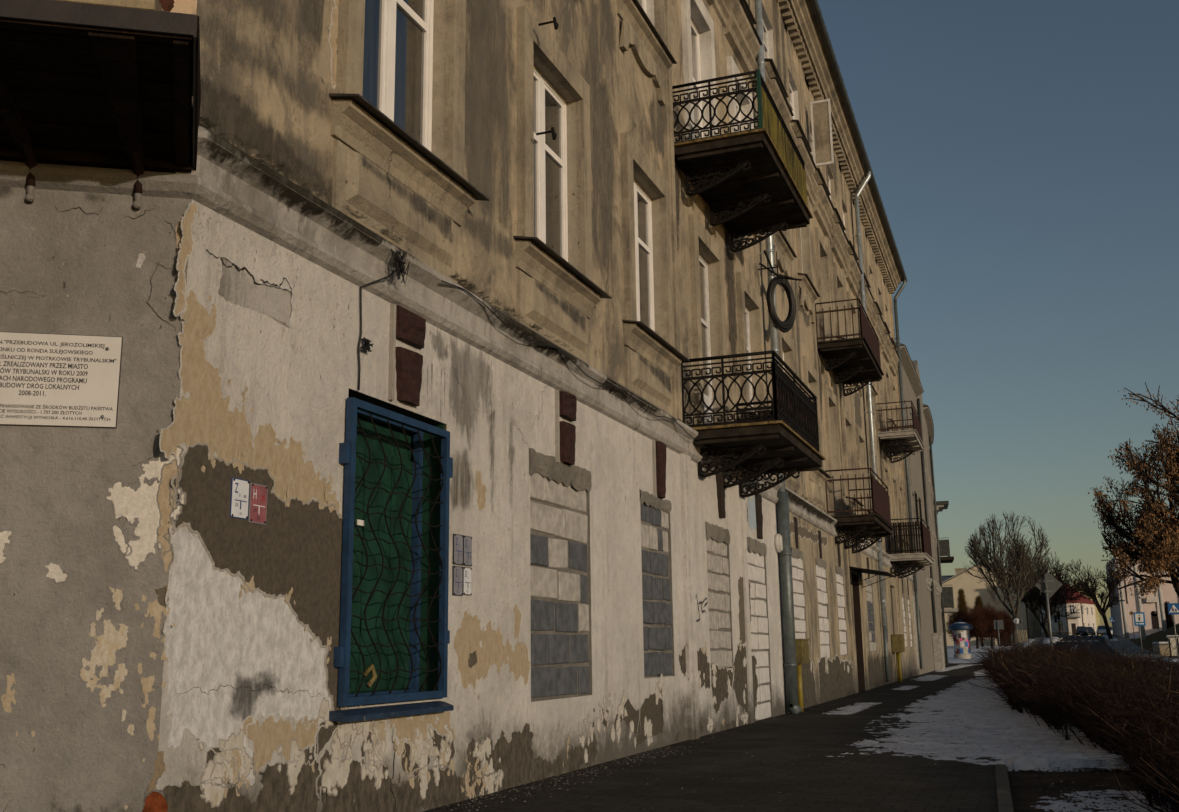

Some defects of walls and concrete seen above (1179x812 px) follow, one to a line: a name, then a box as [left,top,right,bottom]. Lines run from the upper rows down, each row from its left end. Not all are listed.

spalling [156,0,174,12]
leakage [200,20,322,110]
leakage [243,0,324,52]
leakage [192,77,332,205]
leakage [576,0,618,269]
peeling [0,529,14,566]
peeling [80,202,758,812]